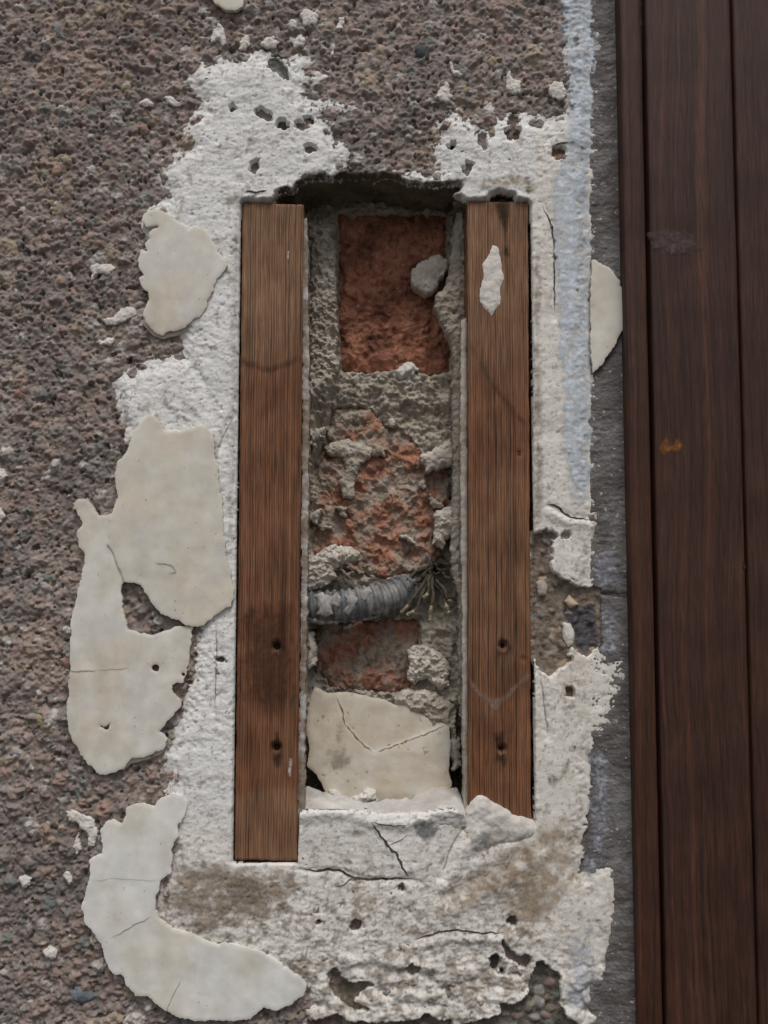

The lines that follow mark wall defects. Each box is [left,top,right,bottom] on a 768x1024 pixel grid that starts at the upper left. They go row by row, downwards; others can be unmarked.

crack [547,504,588,520]
spalling [530,530,602,676]
crack [338,701,444,752]
crack [305,822,414,887]
crack [443,823,465,870]
crack [413,929,503,940]